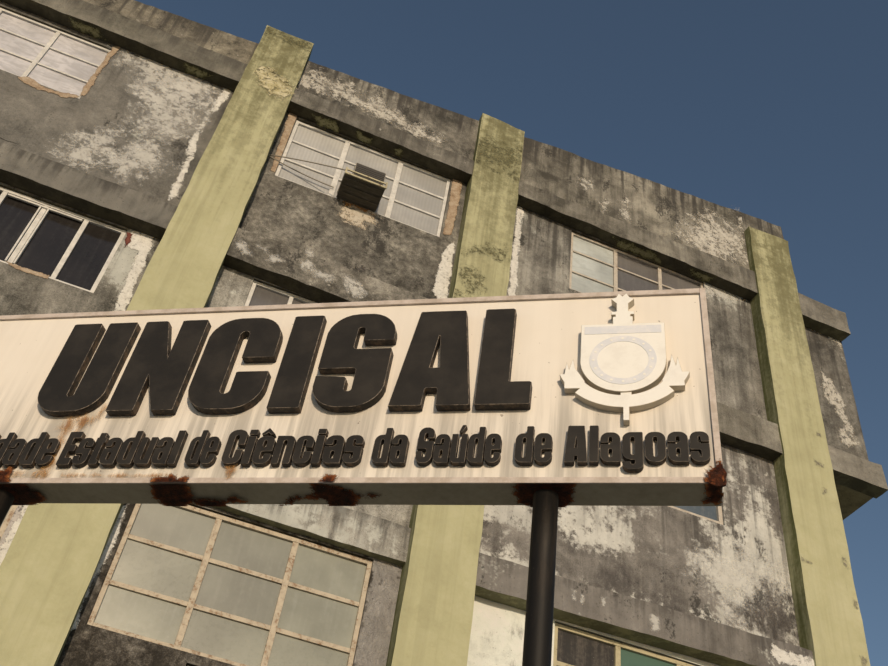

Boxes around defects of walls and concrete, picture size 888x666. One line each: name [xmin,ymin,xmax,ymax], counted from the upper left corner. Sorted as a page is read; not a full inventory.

spalling [18,46,120,98]
water stain [68,55,216,178]
peeling [254,66,444,144]
spalling [5,261,50,279]
water stain [732,526,766,562]
water stain [730,571,799,640]